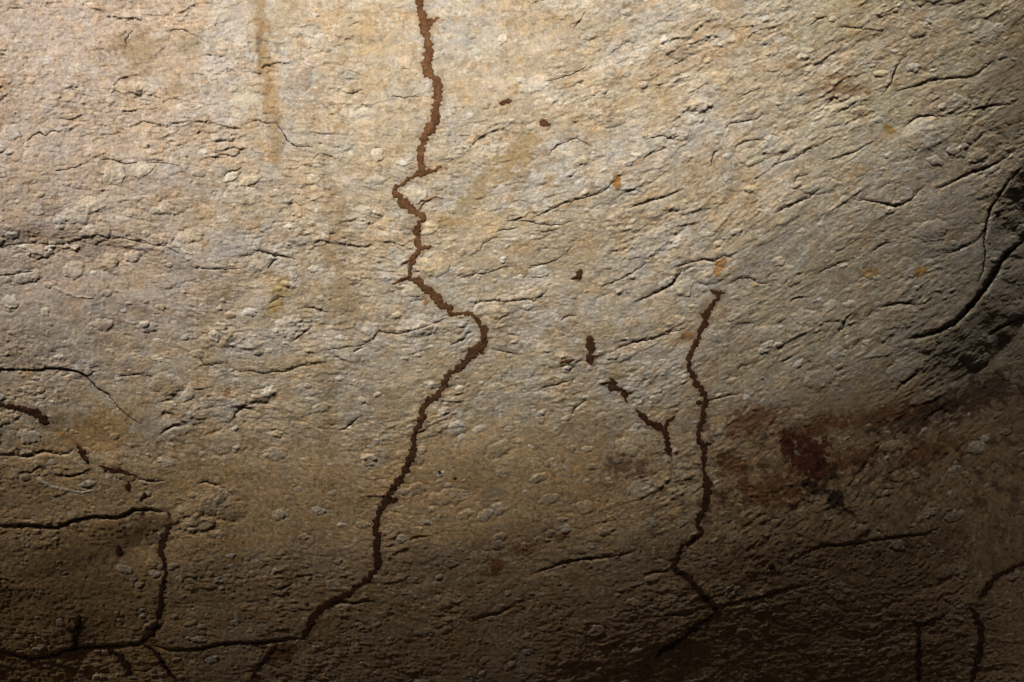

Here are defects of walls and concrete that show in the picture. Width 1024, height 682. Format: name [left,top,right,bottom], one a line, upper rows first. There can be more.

crack [201,296,444,375]
crack [0,367,184,433]
crack [2,509,166,529]